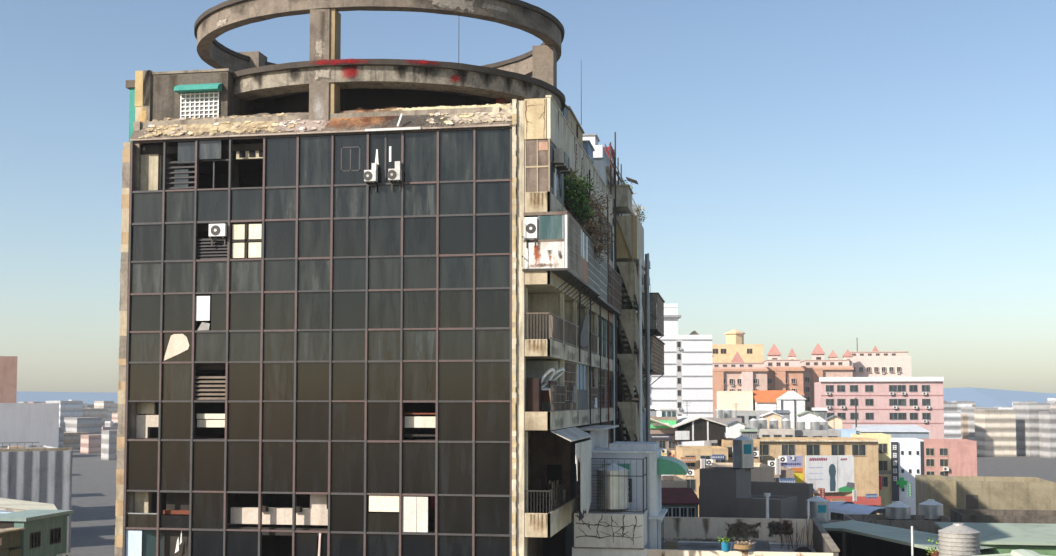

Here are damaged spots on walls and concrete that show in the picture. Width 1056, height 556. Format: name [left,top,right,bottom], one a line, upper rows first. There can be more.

corrosion [534,242,562,267]
crack [575,515,642,545]
water stain [696,519,793,555]